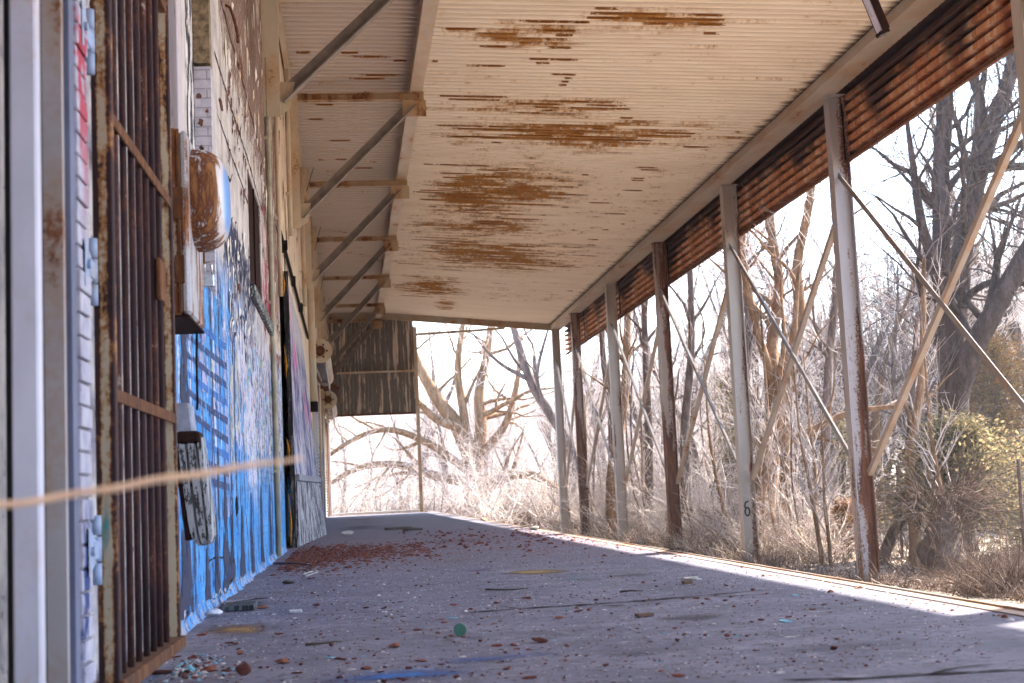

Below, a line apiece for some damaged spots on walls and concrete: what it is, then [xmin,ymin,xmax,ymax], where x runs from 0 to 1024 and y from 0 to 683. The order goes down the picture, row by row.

rust [445,7,726,86]
rust [437,95,741,149]
rust [395,163,625,310]